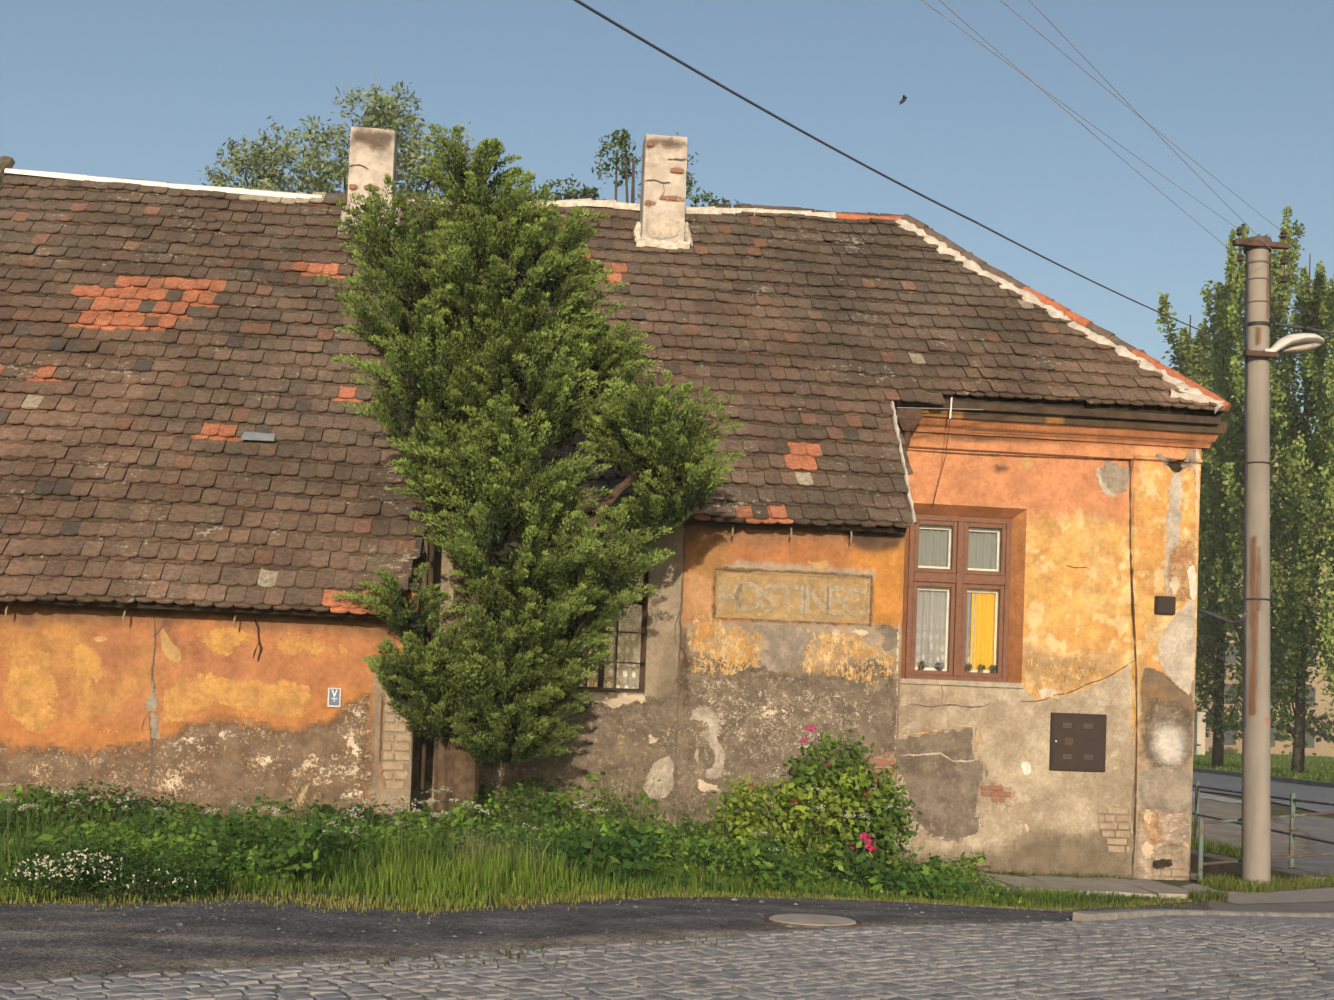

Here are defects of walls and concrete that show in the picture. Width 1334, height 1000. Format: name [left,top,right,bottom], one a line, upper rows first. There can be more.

flaking render [1096,461,1130,498]
peeling [1155,449,1201,601]
peeling [0,636,107,735]
crack [142,617,167,794]
peeling [160,629,313,755]
crack [253,618,263,662]
spalling [288,687,413,802]
flaking render [686,612,1014,843]
crack [902,450,1138,877]
water stain [1141,668,1194,768]
rust [1249,538,1260,715]
flaking render [1096,806,1190,880]